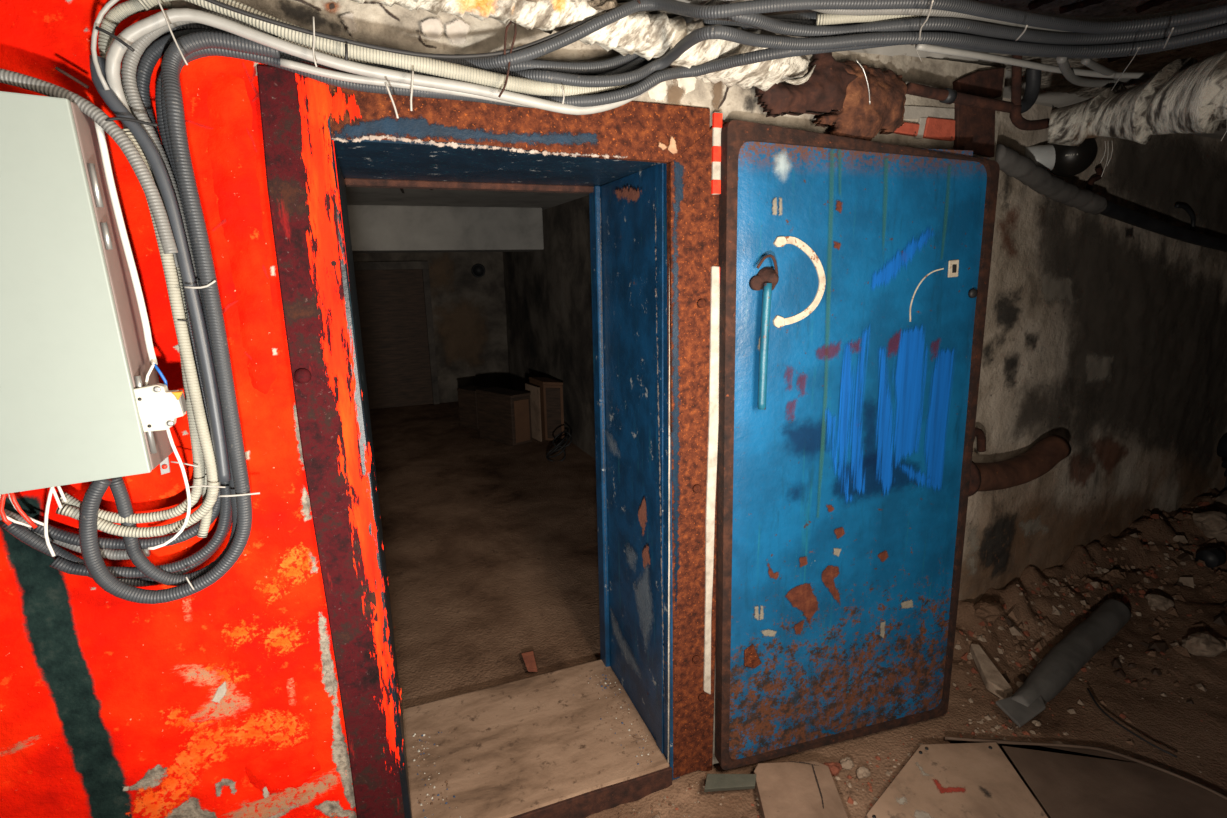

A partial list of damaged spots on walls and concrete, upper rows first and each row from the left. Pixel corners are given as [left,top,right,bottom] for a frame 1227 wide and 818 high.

peeling [421,18,470,45]
spalling [977,38,1227,98]
water stain [1108,134,1227,240]
water stain [995,293,1020,330]
water stain [984,346,1018,386]
water stain [1016,197,1227,505]
peeling [293,405,304,469]
peeling [301,487,312,521]
peeling [256,542,318,606]
corrosion [785,565,841,635]
water stain [960,498,1146,604]
peeling [123,612,357,818]